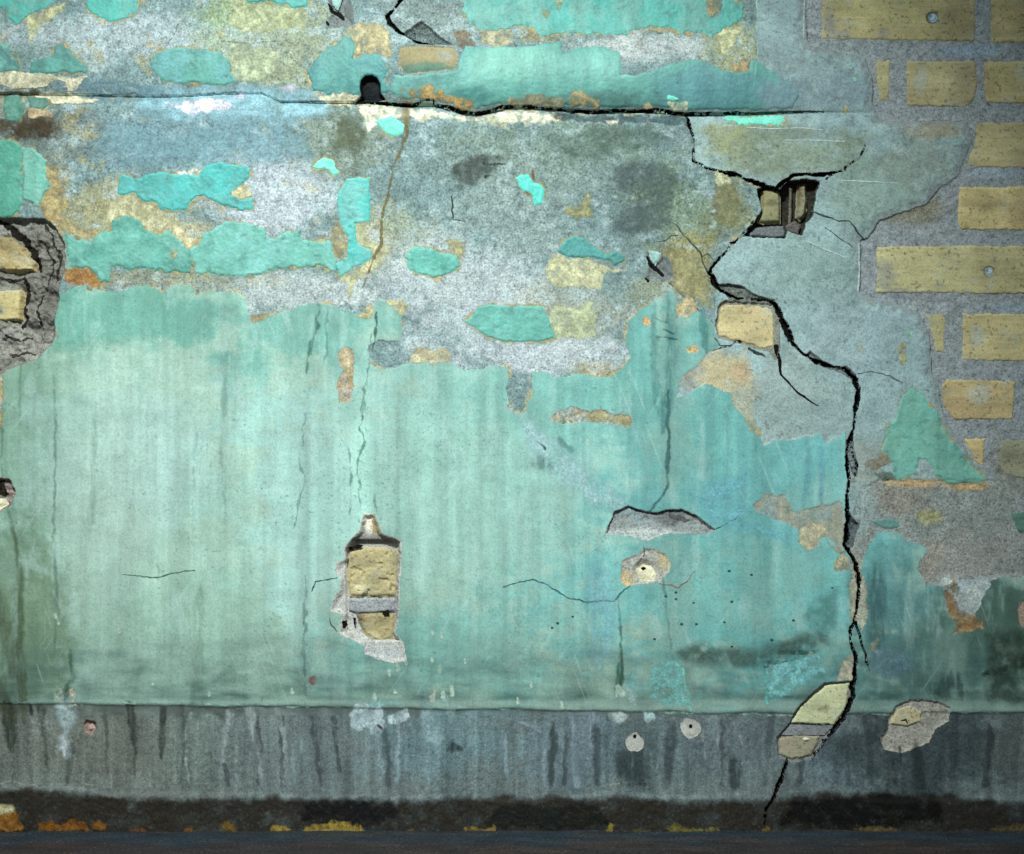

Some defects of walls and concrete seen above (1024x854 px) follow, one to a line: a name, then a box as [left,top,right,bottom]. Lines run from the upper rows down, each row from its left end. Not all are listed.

crack [385,0,454,46]
corrosion [362,109,415,287]
peeling [0,0,1024,635]
crack [93,24,903,825]
leakage [521,419,623,511]
leakage [650,389,671,510]
spalling [330,513,407,663]
leakage [0,685,1024,832]
spalling [625,732,644,752]
leakage [612,639,827,788]
spalling [777,681,852,763]
spalling [880,699,951,753]